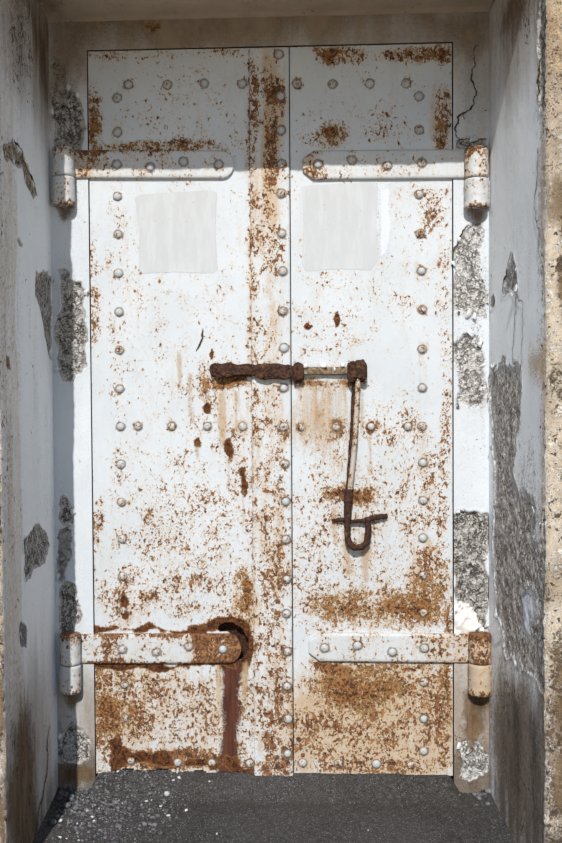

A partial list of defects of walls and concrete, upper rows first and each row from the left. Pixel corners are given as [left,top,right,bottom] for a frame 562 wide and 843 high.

crack [454,45,485,145]
peeling [451,222,518,320]
spalling [35,269,89,384]
corrosion [223,437,234,461]
corrosion [239,467,248,497]
corrosion [322,482,378,508]
peeling [454,329,546,699]
peeling [24,495,83,636]
corrosion [311,569,453,634]
corrosion [95,565,254,773]
corrosion [309,660,453,728]
spalling [456,737,489,782]